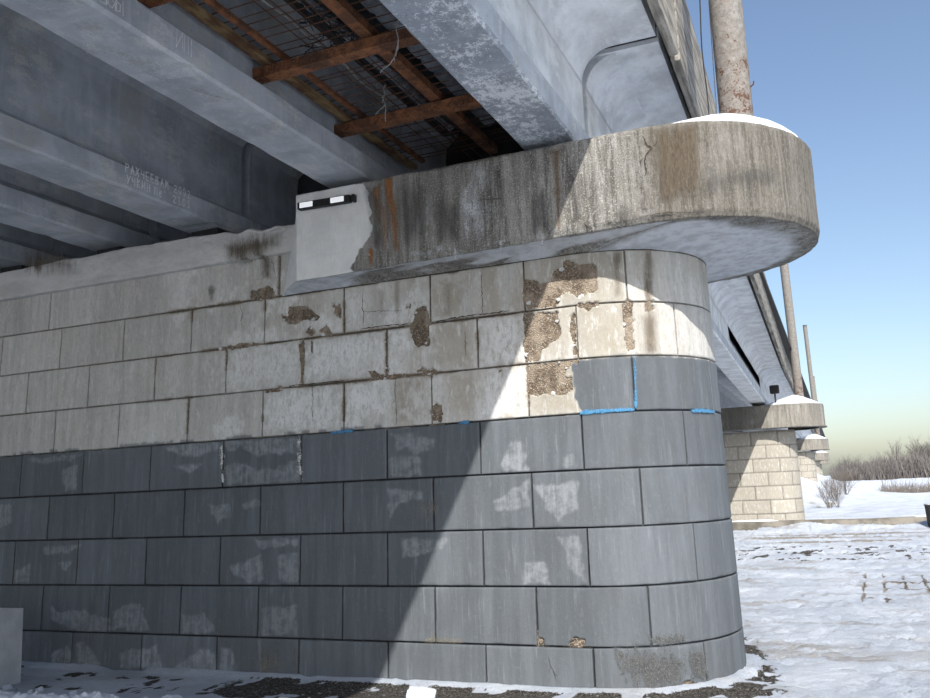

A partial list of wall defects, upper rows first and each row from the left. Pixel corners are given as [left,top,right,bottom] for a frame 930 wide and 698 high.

crack [639,138,657,177]
damp [228,237,273,277]
spalling [332,301,345,322]
spalling [404,304,436,347]
spalling [519,254,604,401]
spalling [260,306,339,393]